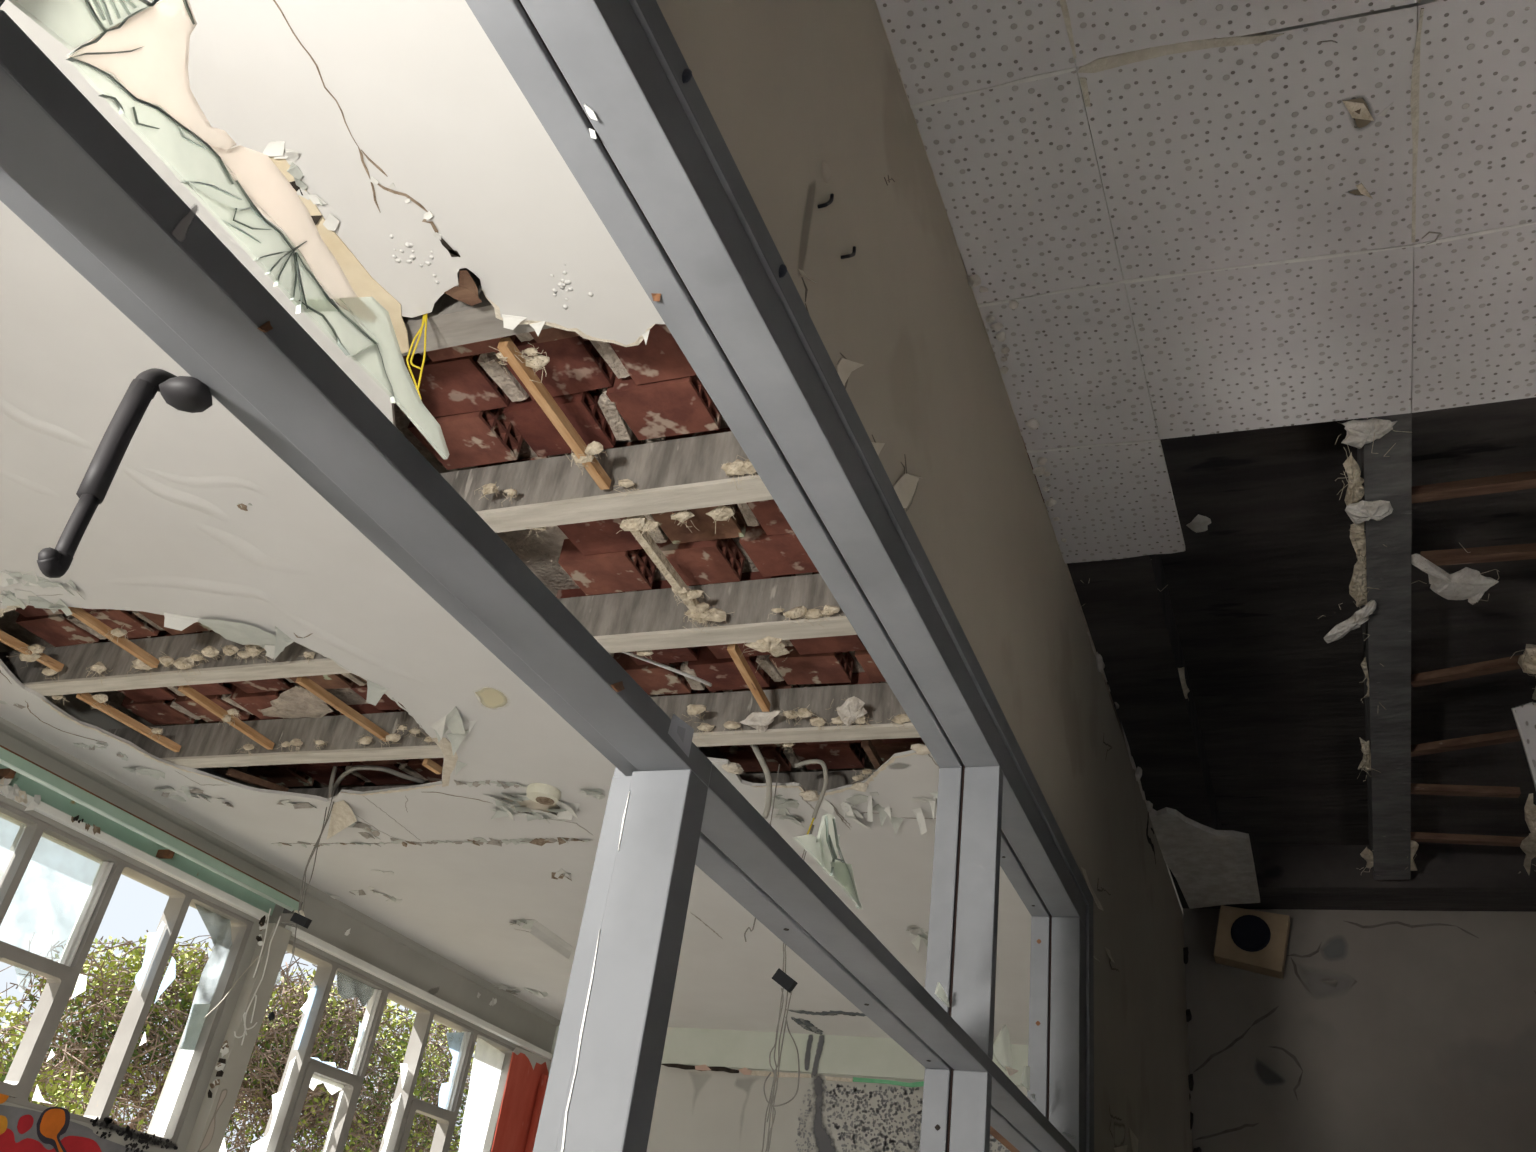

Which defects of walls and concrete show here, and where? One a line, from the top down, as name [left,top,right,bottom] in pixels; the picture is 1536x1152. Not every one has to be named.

crack [273,0,482,306]
peeling [584,104,598,139]
peeling [263,141,409,353]
spalling [482,289,655,347]
peeling [164,612,201,631]
peeling [0,698,234,811]
crack [405,792,493,813]
peeling [722,744,938,835]
spalling [1087,632,1153,813]
spalling [1511,702,1536,790]